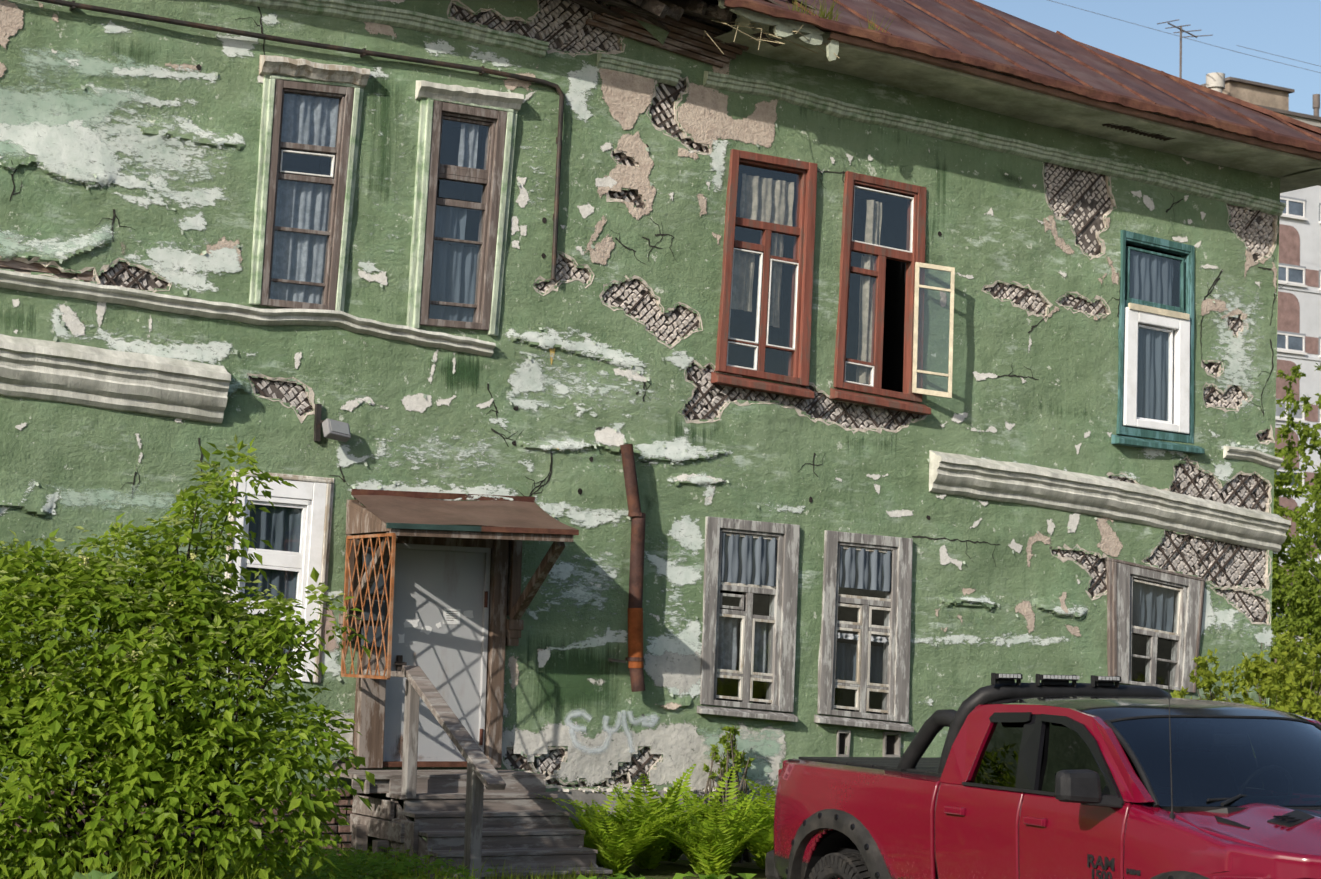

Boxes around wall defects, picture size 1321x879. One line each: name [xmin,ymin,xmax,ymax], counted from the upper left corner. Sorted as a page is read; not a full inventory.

peeling [215,13,280,58]
flaking render [958,162,1119,322]
peeling [1131,190,1156,211]
peeling [1172,212,1206,248]
peeling [50,302,257,366]
peeling [1201,204,1279,417]
flaking render [228,352,315,424]
flaking render [336,0,930,791]
peeling [940,412,1015,433]
peeling [972,371,997,381]
flaking render [1104,425,1275,513]
flaking render [1142,529,1274,649]